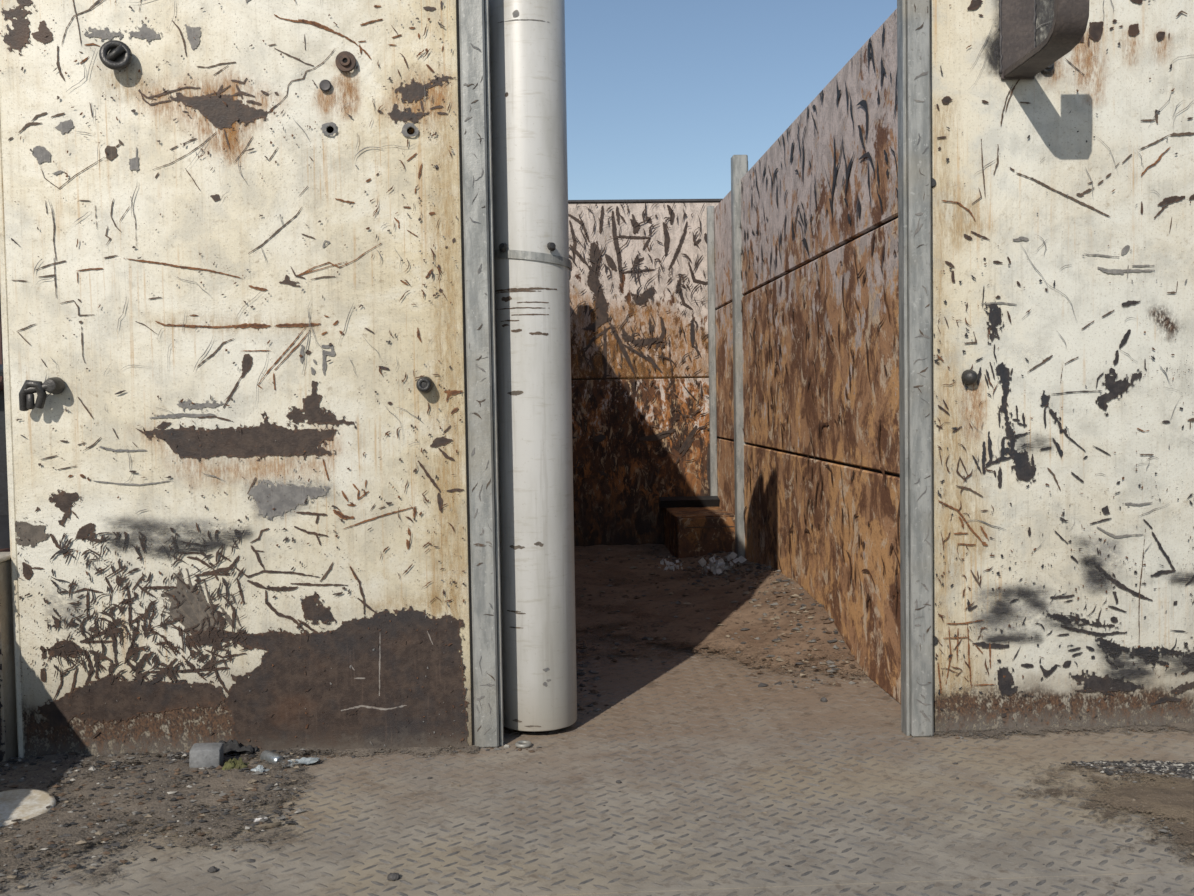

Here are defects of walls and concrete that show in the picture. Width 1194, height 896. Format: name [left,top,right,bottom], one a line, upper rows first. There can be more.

peeling [1,0,53,55]
spalling [138,78,280,149]
corrosion [570,295,709,377]
peeling [136,354,356,462]
peeling [972,287,1147,488]
peeling [248,479,330,520]
peeling [973,641,1009,649]
peeling [994,591,1194,706]
corrosion [22,695,261,758]
corrosion [934,652,1194,733]